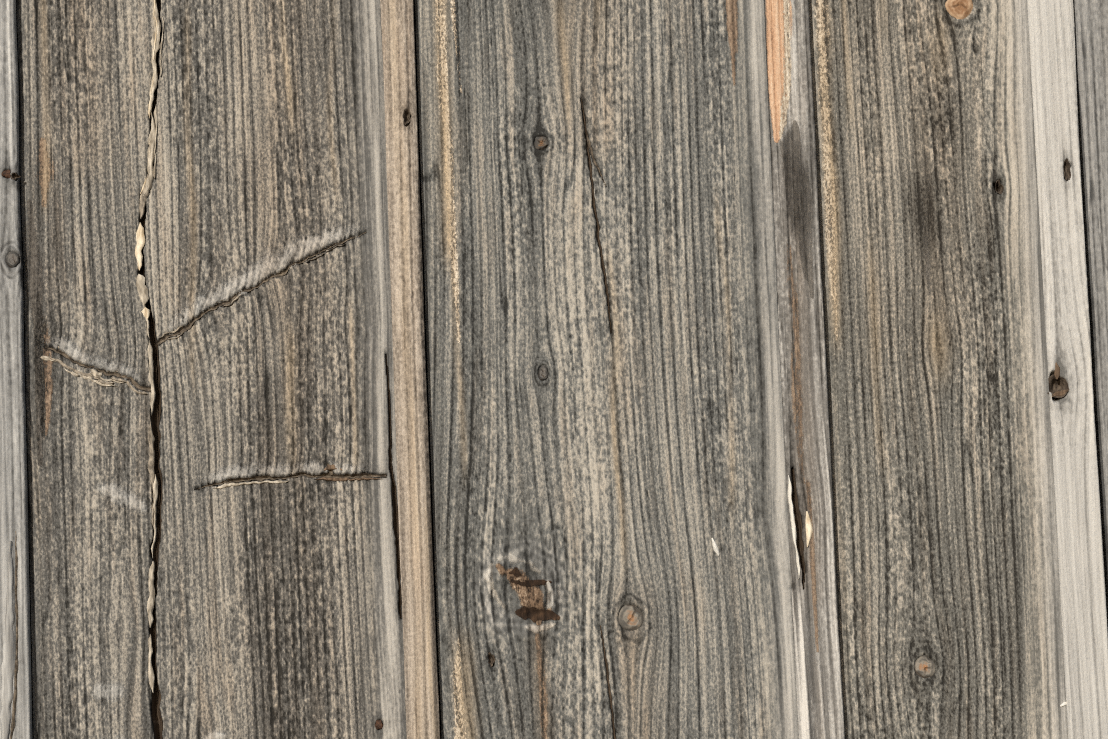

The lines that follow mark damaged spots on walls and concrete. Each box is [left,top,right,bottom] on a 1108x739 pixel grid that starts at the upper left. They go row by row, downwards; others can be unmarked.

crack [581,99,611,333]
crack [40,0,366,739]
crack [194,355,402,618]
crack [787,469,813,588]